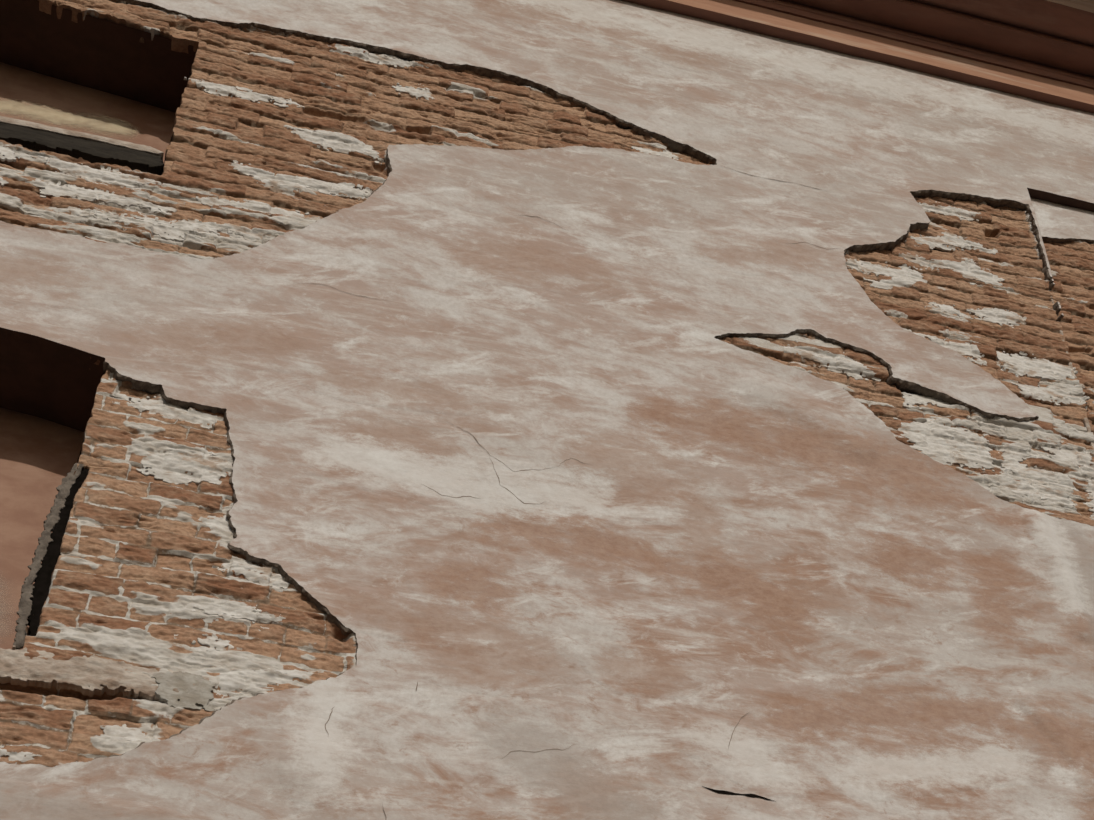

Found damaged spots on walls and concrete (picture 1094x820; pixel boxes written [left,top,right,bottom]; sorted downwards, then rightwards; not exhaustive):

spalling [0,0,717,259]
spalling [714,190,1094,526]
spalling [0,357,358,767]
crack [703,786,774,801]